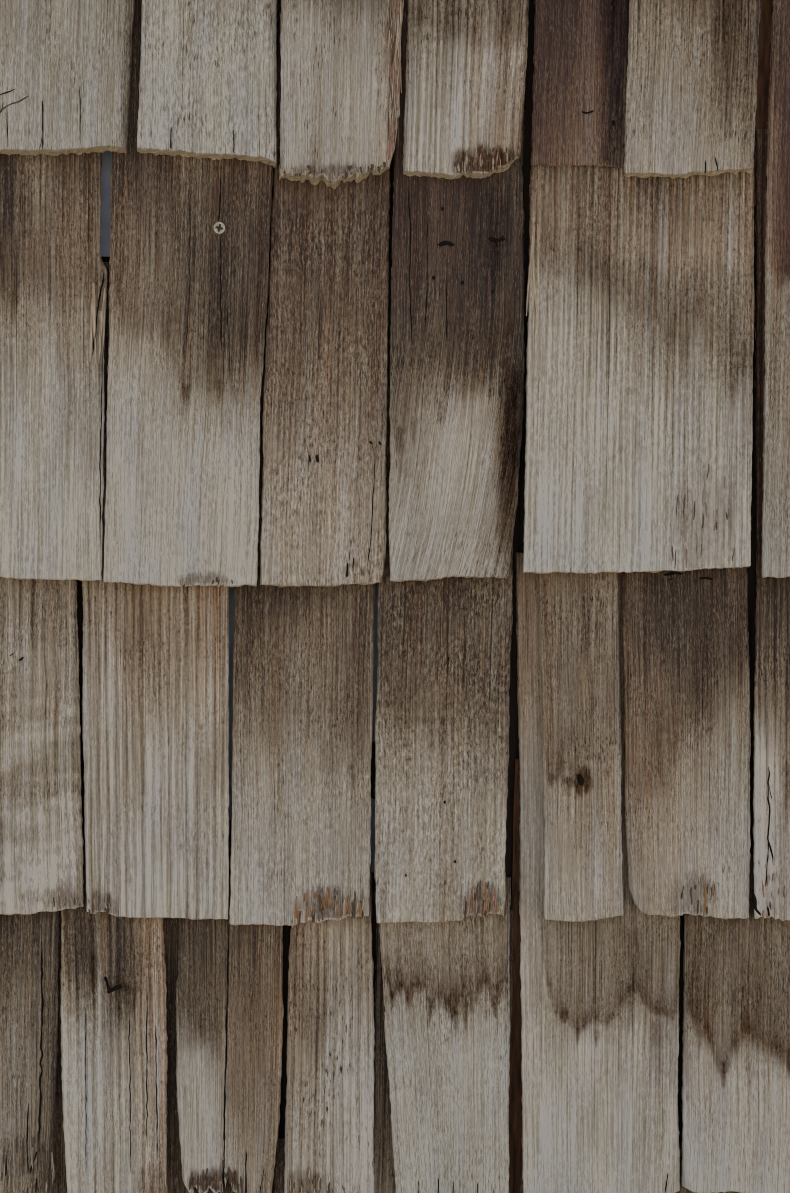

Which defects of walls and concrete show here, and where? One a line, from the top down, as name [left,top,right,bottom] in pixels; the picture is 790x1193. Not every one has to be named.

leakage [386,971,426,1002]
leakage [723,1014,790,1077]